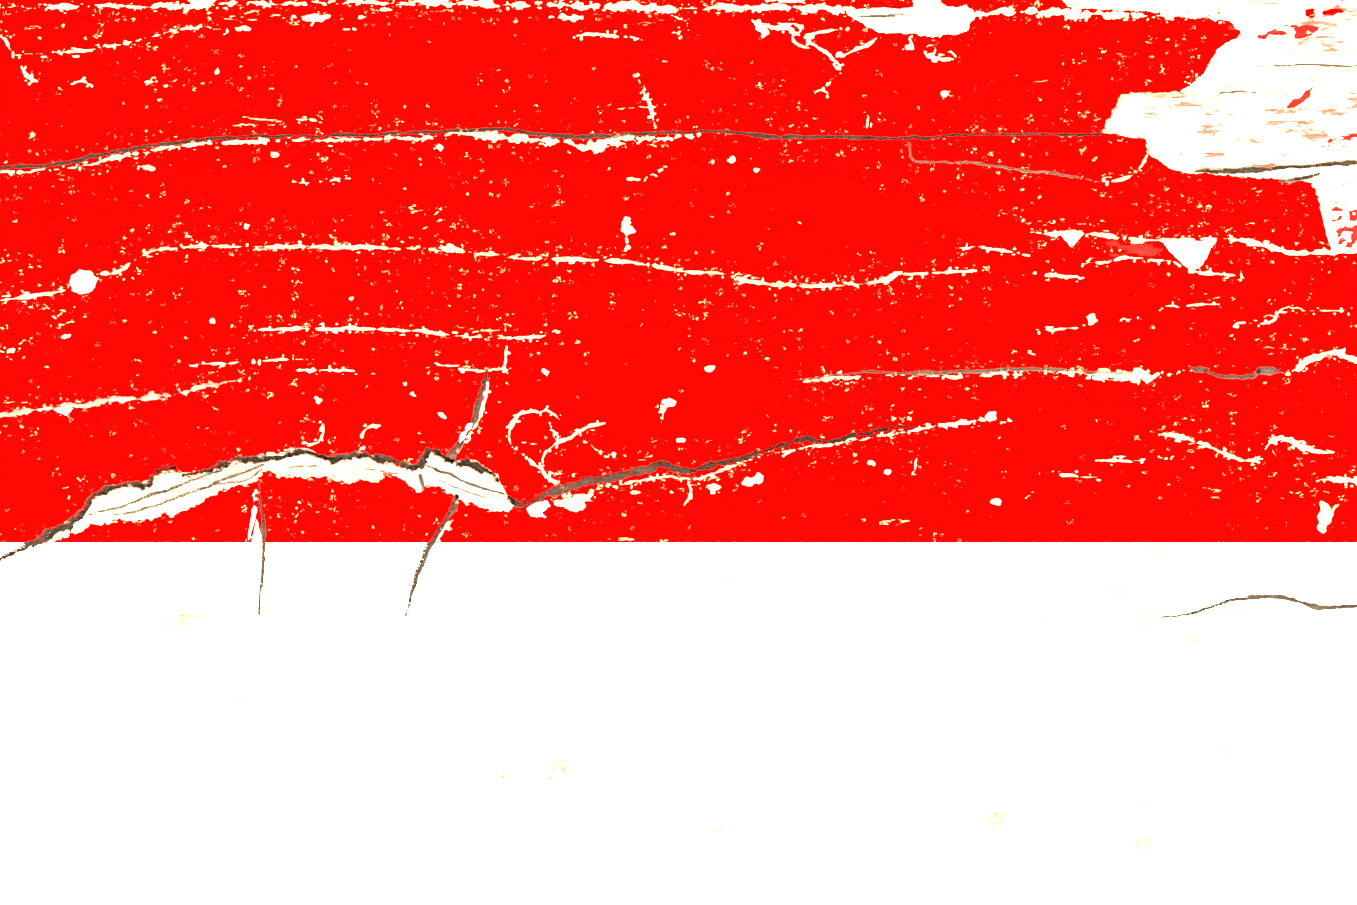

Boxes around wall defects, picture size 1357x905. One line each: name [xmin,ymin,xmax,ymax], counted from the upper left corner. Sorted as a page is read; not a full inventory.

crack [0,73,1148,186]
peeling [0,0,1357,282]
crack [793,348,1357,385]
crack [0,369,1040,626]
crack [1162,594,1357,618]